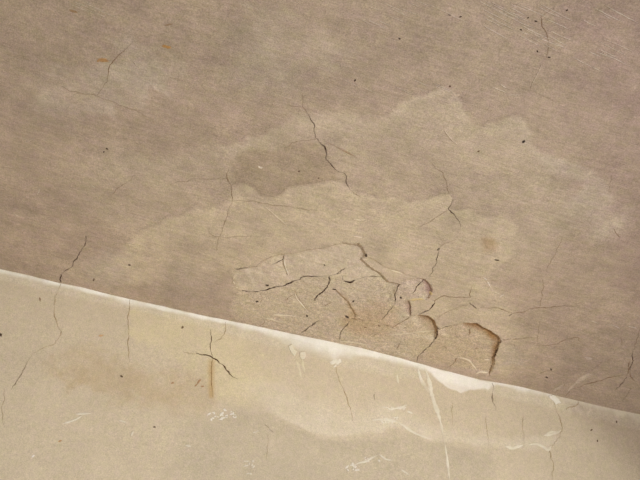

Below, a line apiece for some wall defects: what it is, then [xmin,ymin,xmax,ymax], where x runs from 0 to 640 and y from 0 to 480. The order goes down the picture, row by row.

crack [284,94,362,198]
crack [173,172,318,245]
crack [1,243,86,422]
rust [195,357,218,401]
crack [185,322,237,397]
spalling [0,241,640,423]